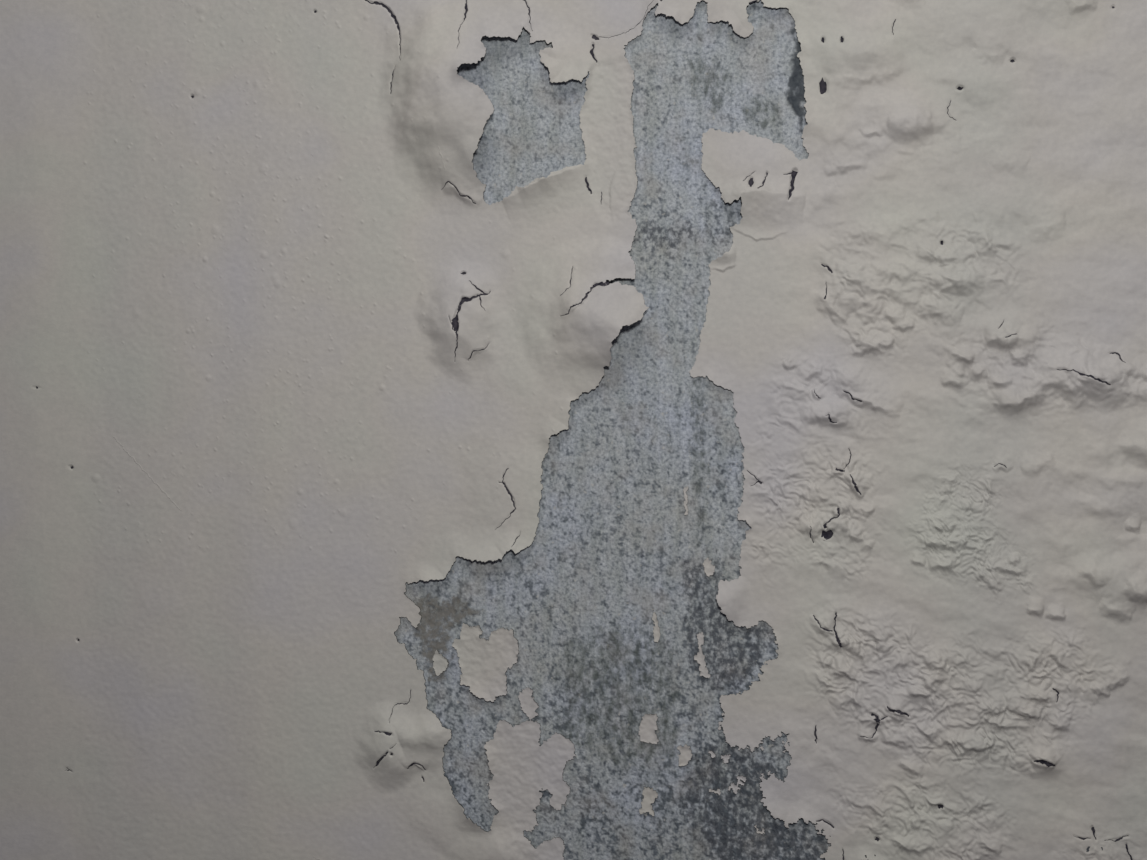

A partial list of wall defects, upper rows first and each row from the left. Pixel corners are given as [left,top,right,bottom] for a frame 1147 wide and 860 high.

crack [365,0,401,94]
crack [449,281,491,362]
crack [560,268,609,316]
peeling [394,0,876,860]
crack [374,690,426,782]
crack [1075,827,1132,860]